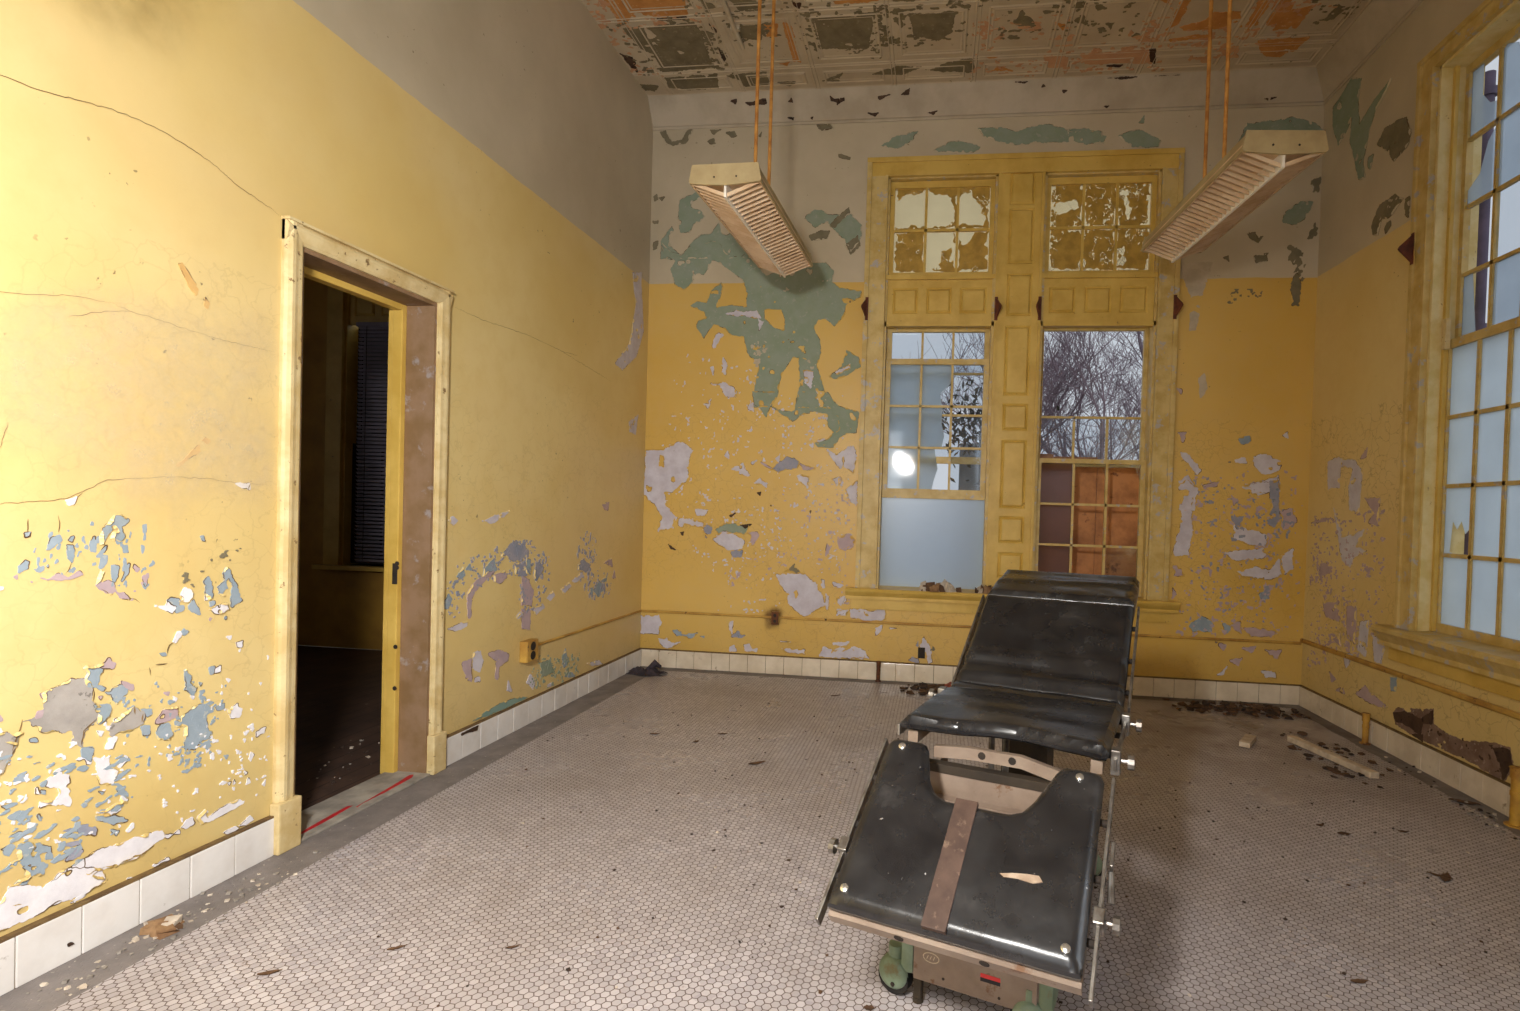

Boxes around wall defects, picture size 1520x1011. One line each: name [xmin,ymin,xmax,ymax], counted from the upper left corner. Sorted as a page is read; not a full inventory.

crack [1,75,272,209]
peeling [1238,77,1411,180]
peeling [1282,175,1322,306]
peeling [1371,194,1411,236]
crack [0,291,264,350]
peeling [615,272,644,371]
peeling [640,192,897,652]
peeling [0,494,270,932]
peeling [444,531,617,632]
peeling [461,648,603,736]
peeling [780,641,869,660]
peeling [1172,431,1514,781]